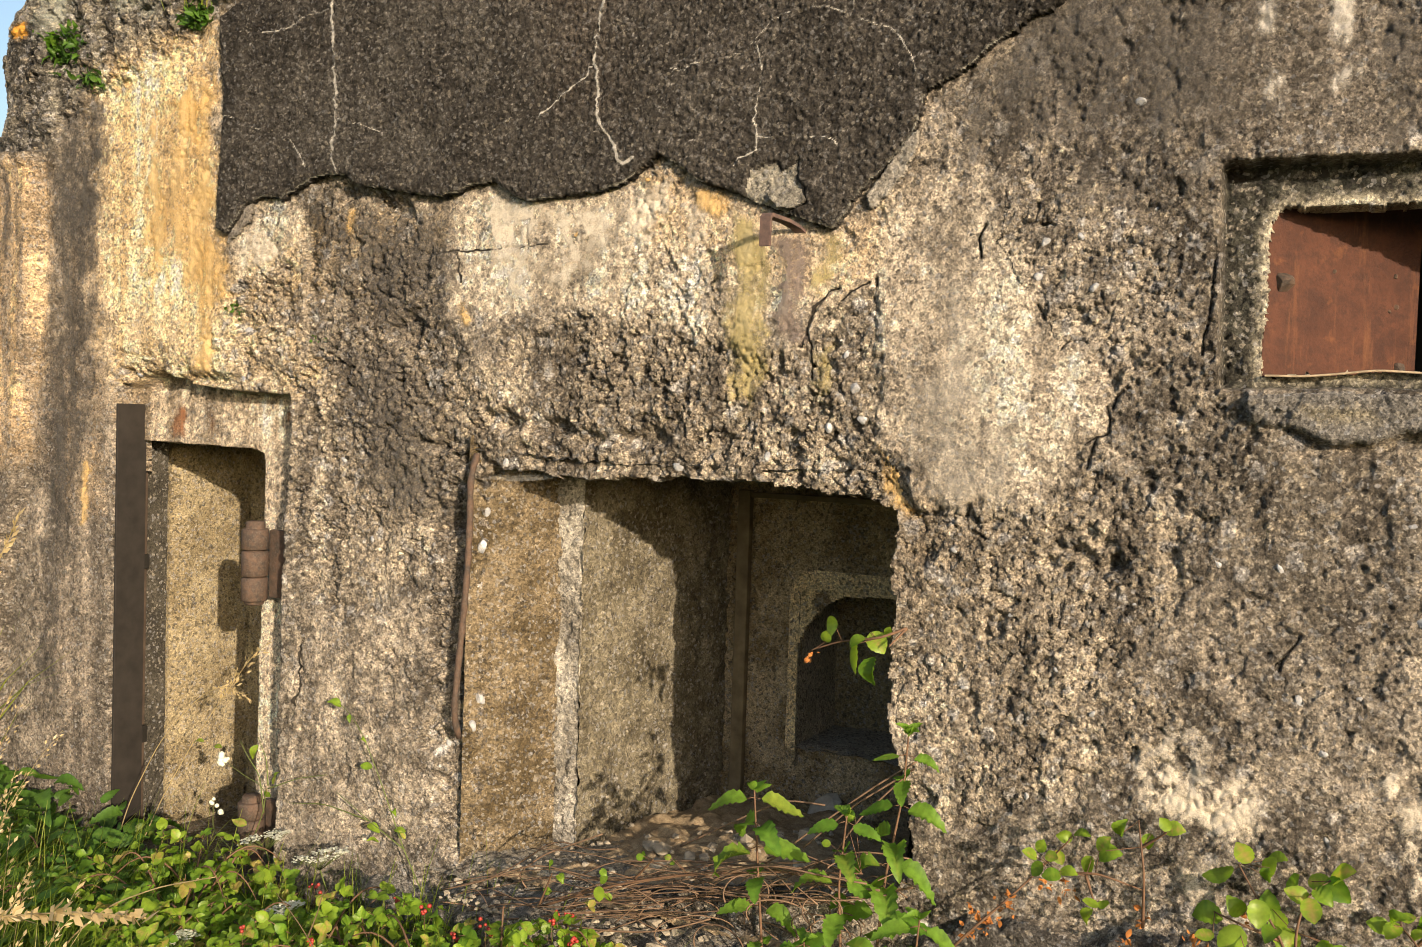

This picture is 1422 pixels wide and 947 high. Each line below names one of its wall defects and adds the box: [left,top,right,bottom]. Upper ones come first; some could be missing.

crack [224,1,379,171]
crack [488,0,634,165]
crack [732,11,790,166]
crack [830,7,915,66]
rust [696,188,840,399]
spalling [121,147,1267,863]
peeling [1181,859,1219,903]